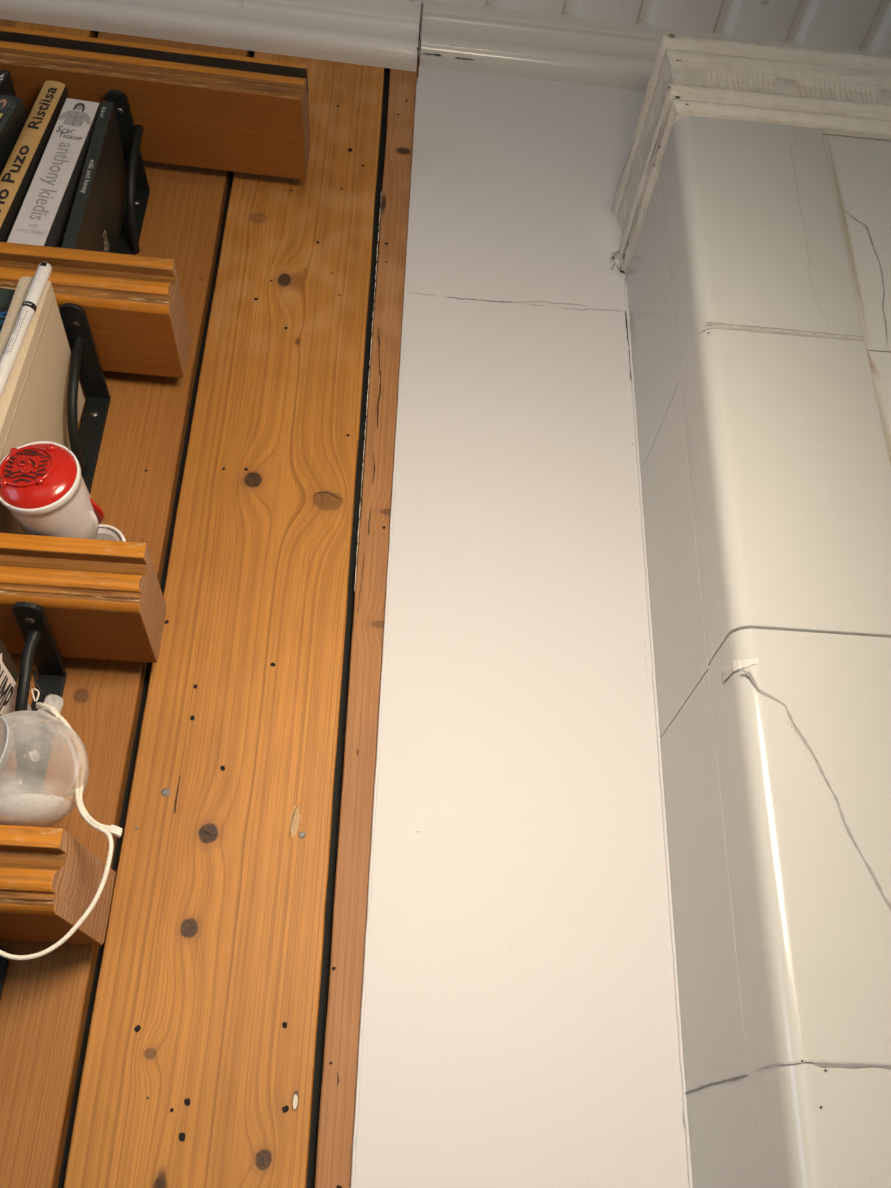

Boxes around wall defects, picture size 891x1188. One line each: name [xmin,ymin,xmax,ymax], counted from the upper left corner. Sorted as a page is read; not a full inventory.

crack [410,292,631,379]
crack [840,207,888,340]
crack [740,669,891,910]
crack [682,1060,891,1125]